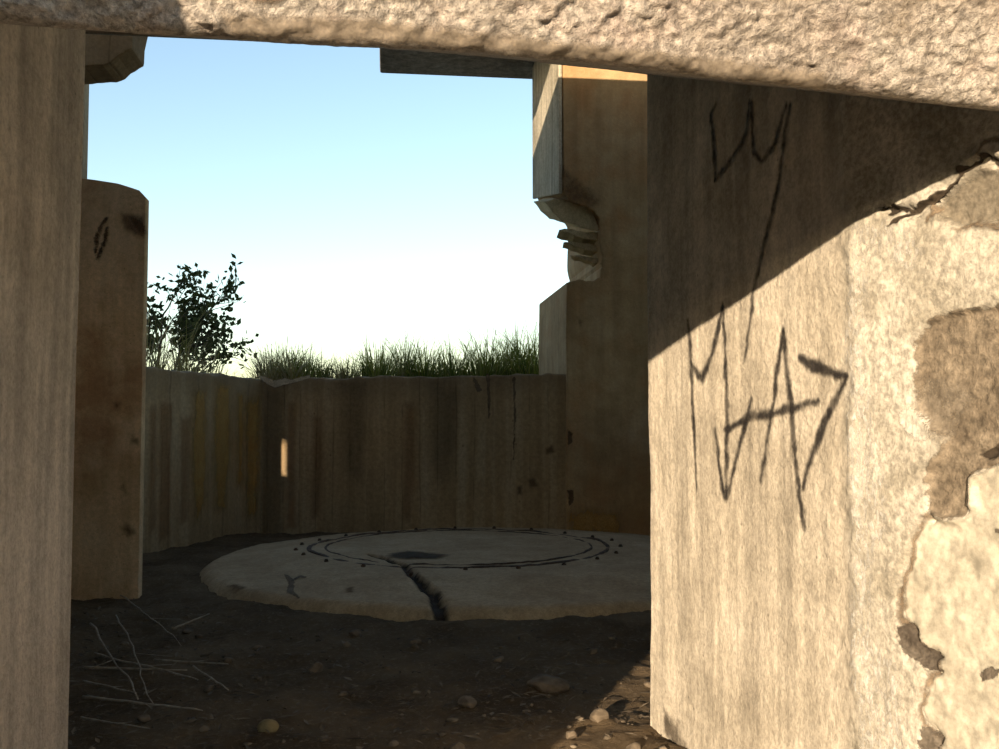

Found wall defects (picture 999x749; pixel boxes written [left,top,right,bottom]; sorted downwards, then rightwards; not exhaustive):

crack [881,137,999,230]
crack [379,558,447,621]
peeling [845,223,918,749]
peeling [896,303,999,749]